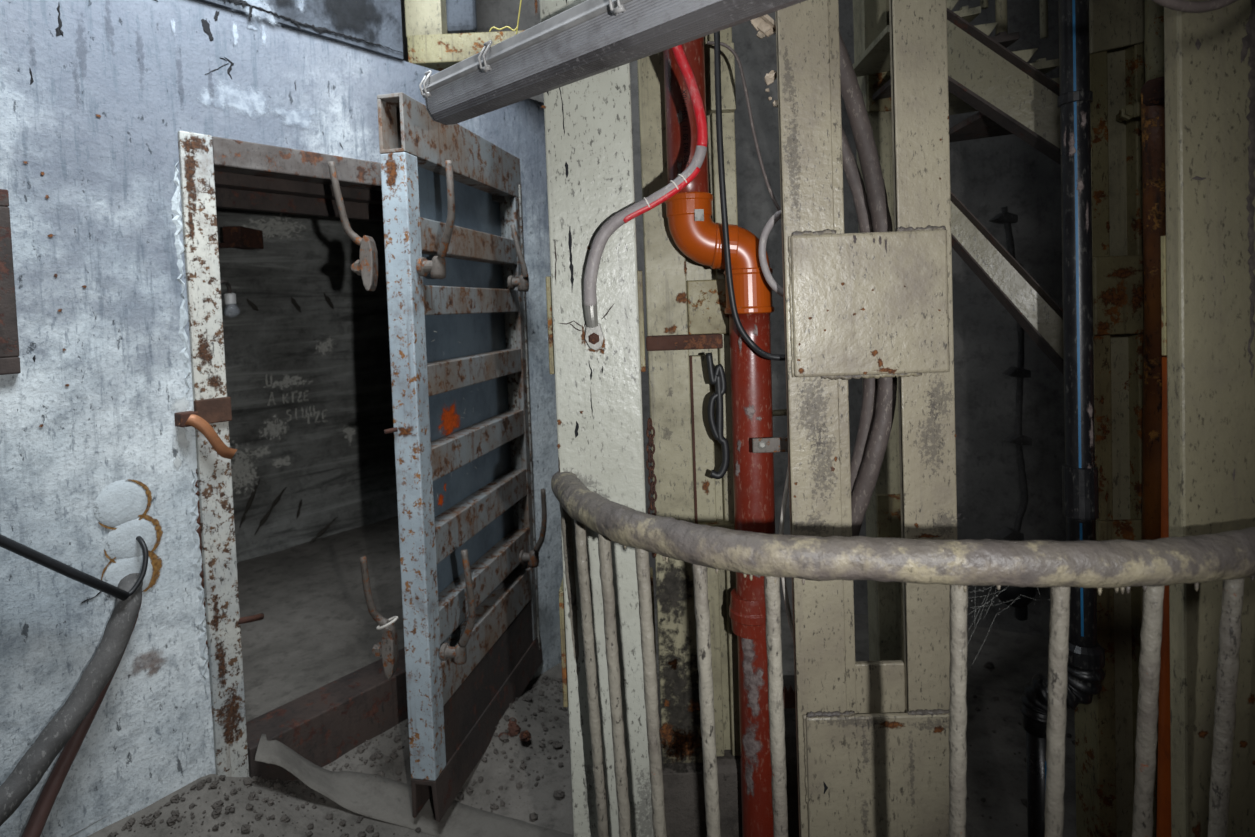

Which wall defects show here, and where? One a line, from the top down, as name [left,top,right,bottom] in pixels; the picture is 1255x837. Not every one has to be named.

rust [184,136,209,244]
rust [197,331,221,391]